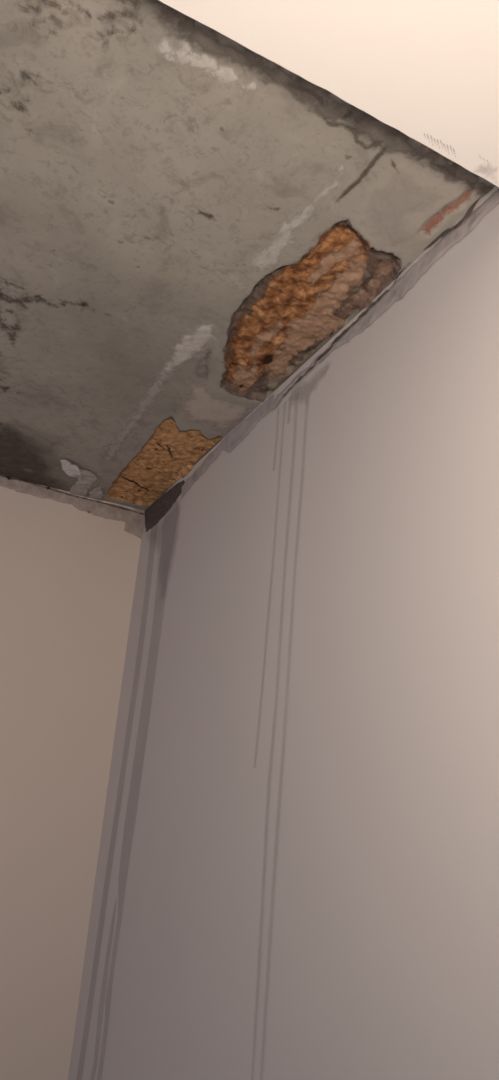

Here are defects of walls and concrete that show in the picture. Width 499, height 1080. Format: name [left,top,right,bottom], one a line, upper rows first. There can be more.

spalling [0,189,499,539]